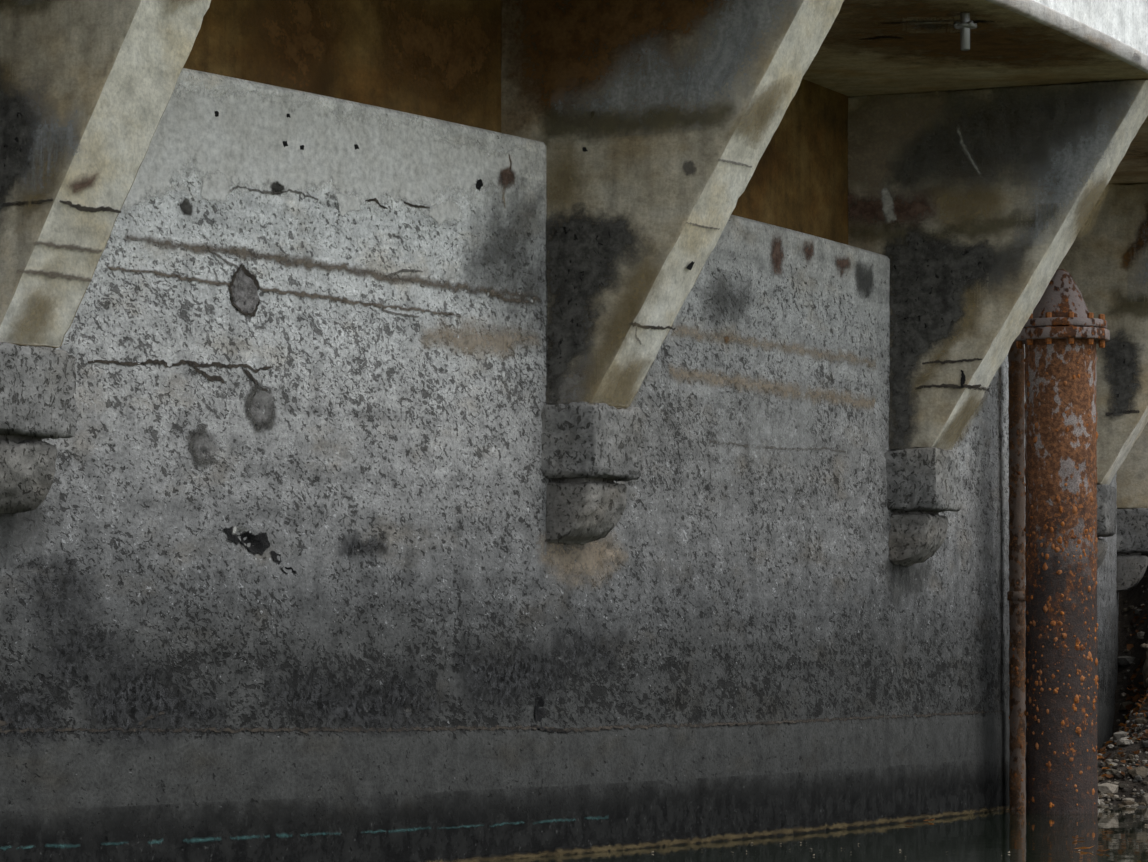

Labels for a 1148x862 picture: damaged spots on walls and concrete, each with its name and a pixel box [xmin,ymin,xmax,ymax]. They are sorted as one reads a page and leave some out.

crack [230,186,319,200]
corrosion [1076,178,1107,233]
crack [3,198,540,318]
corrosion [772,239,784,273]
corrosion [804,243,814,260]
corrosion [836,258,851,276]
corrosion [1123,204,1148,269]
crack [88,359,272,392]
crack [916,358,990,391]
spalling [222,527,297,574]